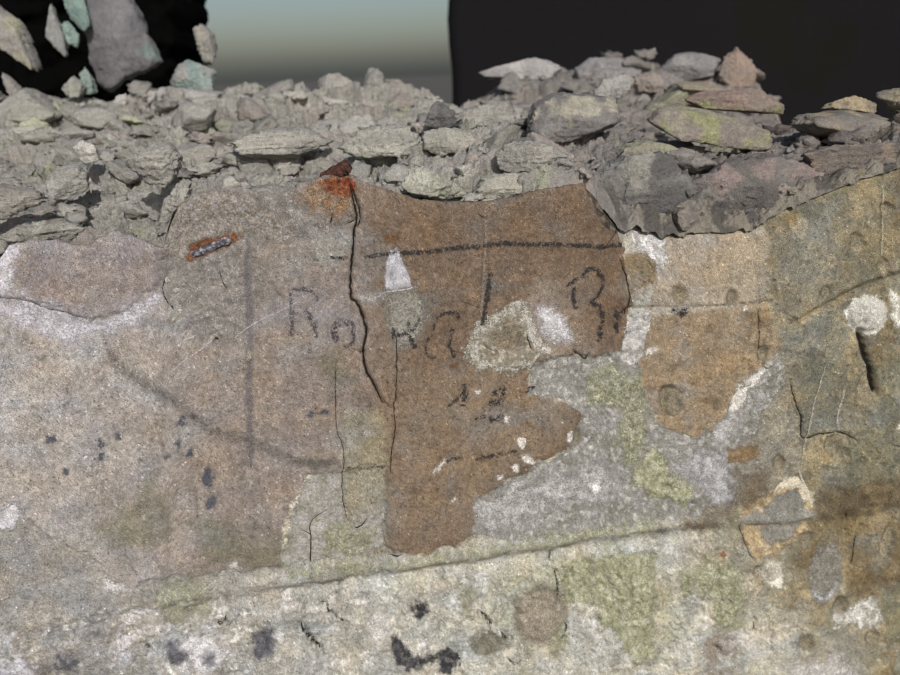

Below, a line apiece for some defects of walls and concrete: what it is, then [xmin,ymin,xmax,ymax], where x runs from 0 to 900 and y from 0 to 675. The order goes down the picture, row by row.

rust [186,232,241,261]
rust [294,176,360,216]
crack [330,182,398,472]
spalling [461,300,786,542]